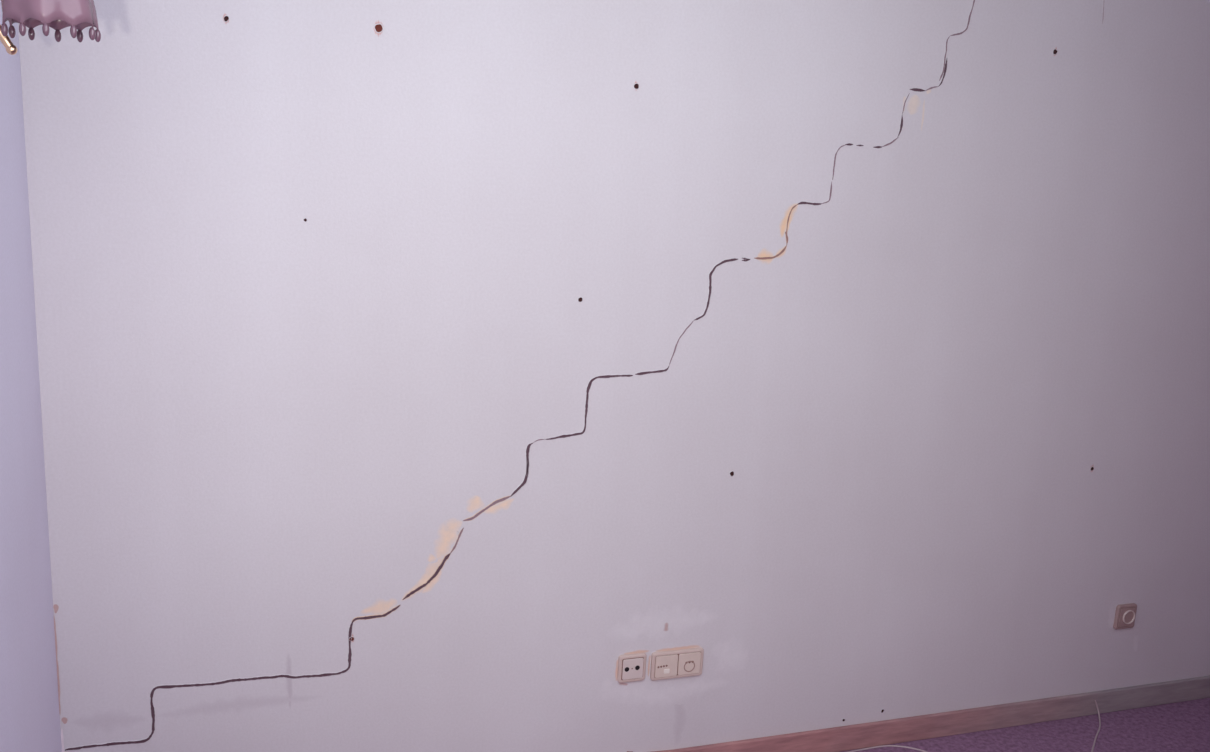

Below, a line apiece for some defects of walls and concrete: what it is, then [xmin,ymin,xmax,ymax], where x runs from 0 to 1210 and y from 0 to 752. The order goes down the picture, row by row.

flaking render [360,495,515,616]
crack [65,0,975,751]